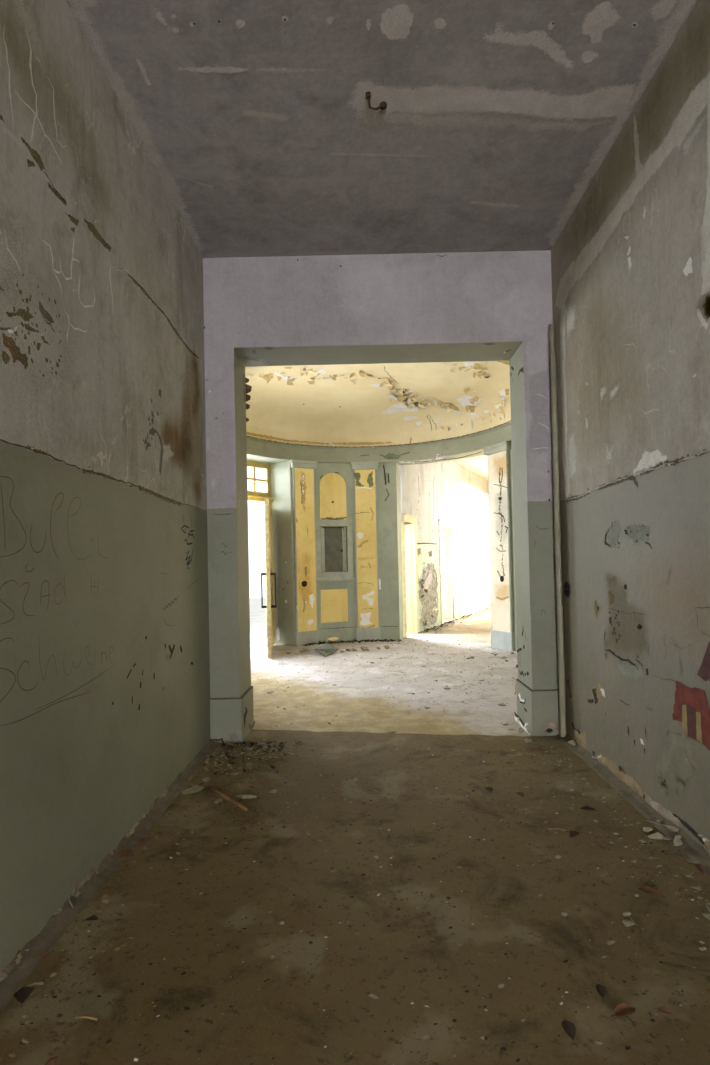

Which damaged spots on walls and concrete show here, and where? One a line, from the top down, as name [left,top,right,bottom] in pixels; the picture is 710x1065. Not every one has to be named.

crack [3,25,66,165]
peeling [0,274,63,390]
crack [43,239,113,340]
peeling [0,115,199,359]
spalling [696,291,710,330]
peeling [242,347,524,431]
water stain [159,437,174,474]
peeling [354,451,483,501]
peeling [417,492,447,630]
peeling [493,468,510,581]
peeling [564,449,710,503]
flaking render [543,720,710,854]